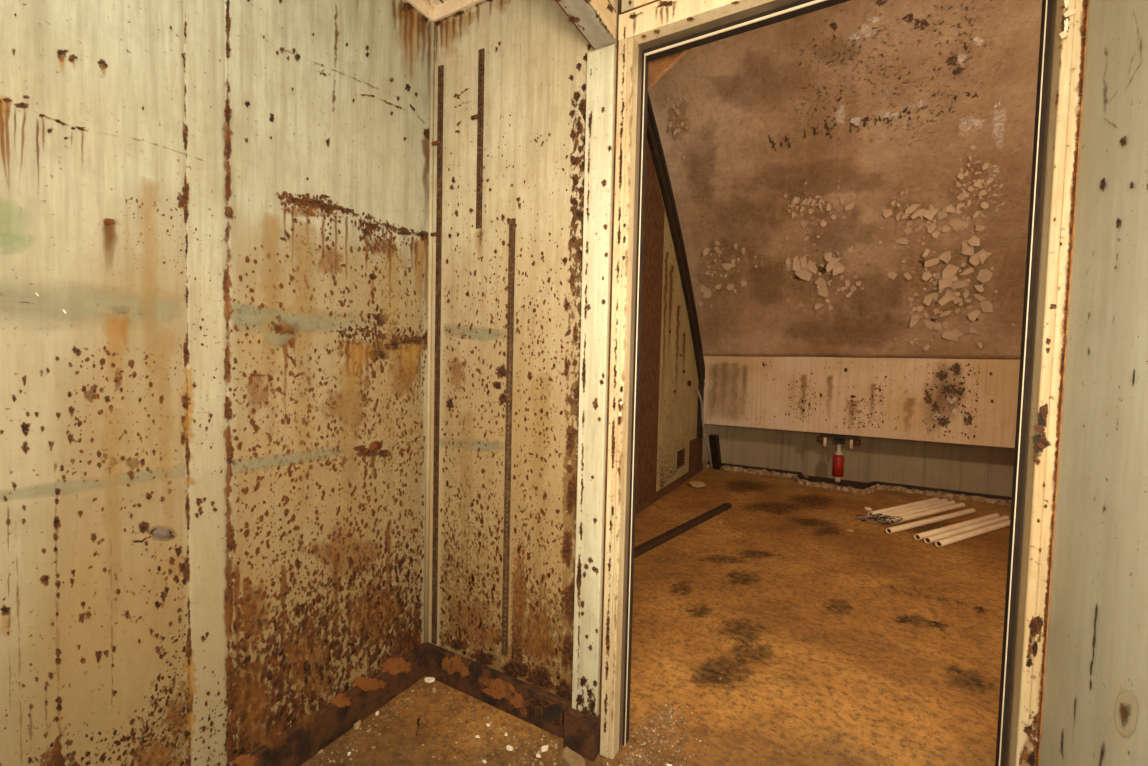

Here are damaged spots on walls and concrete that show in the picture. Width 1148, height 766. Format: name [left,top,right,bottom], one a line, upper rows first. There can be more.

corrosion [0,95,87,162]
corrosion [104,219,115,250]
corrosion [170,21,189,307]
corrosion [223,79,250,382]
corrosion [277,178,429,402]
corrosion [393,0,502,70]
corrosion [439,0,675,732]
peeling [786,245,863,311]
corrosion [747,361,914,430]
water stain [790,0,986,141]
peeling [878,116,1005,439]
corrosion [9,324,425,766]